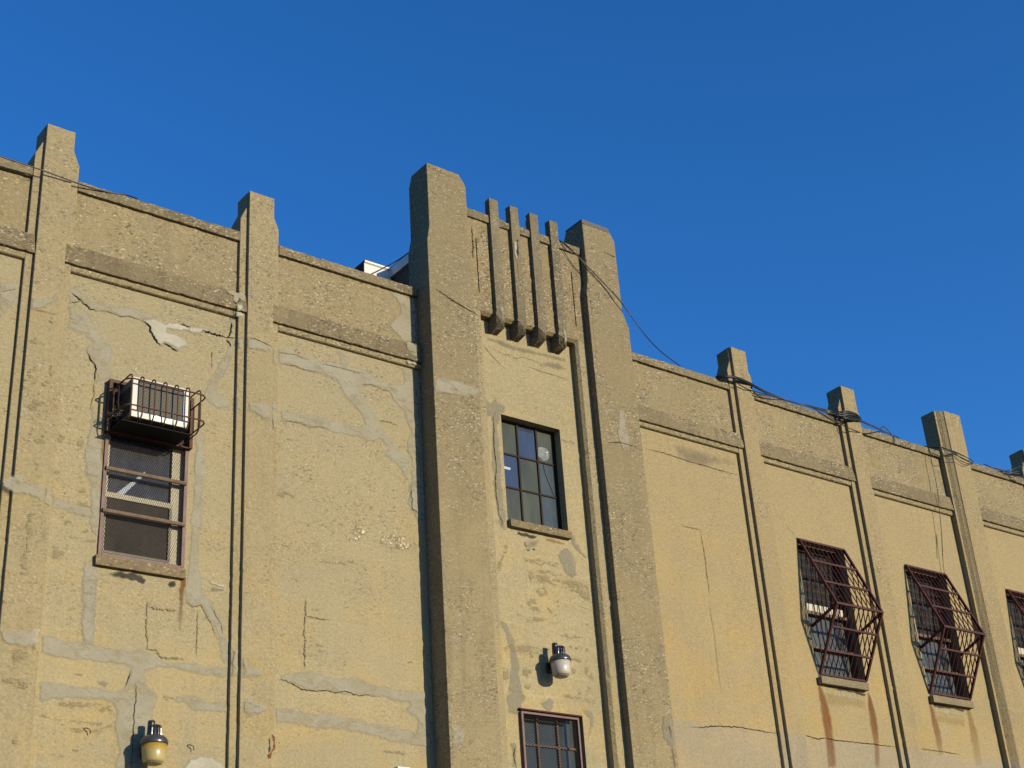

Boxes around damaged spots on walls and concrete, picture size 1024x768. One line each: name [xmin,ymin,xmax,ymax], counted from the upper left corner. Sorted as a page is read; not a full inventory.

crack [32,295,389,391]
crack [145,601,223,659]
crack [281,601,375,697]
rust [819,686,833,755]
rust [869,695,878,737]